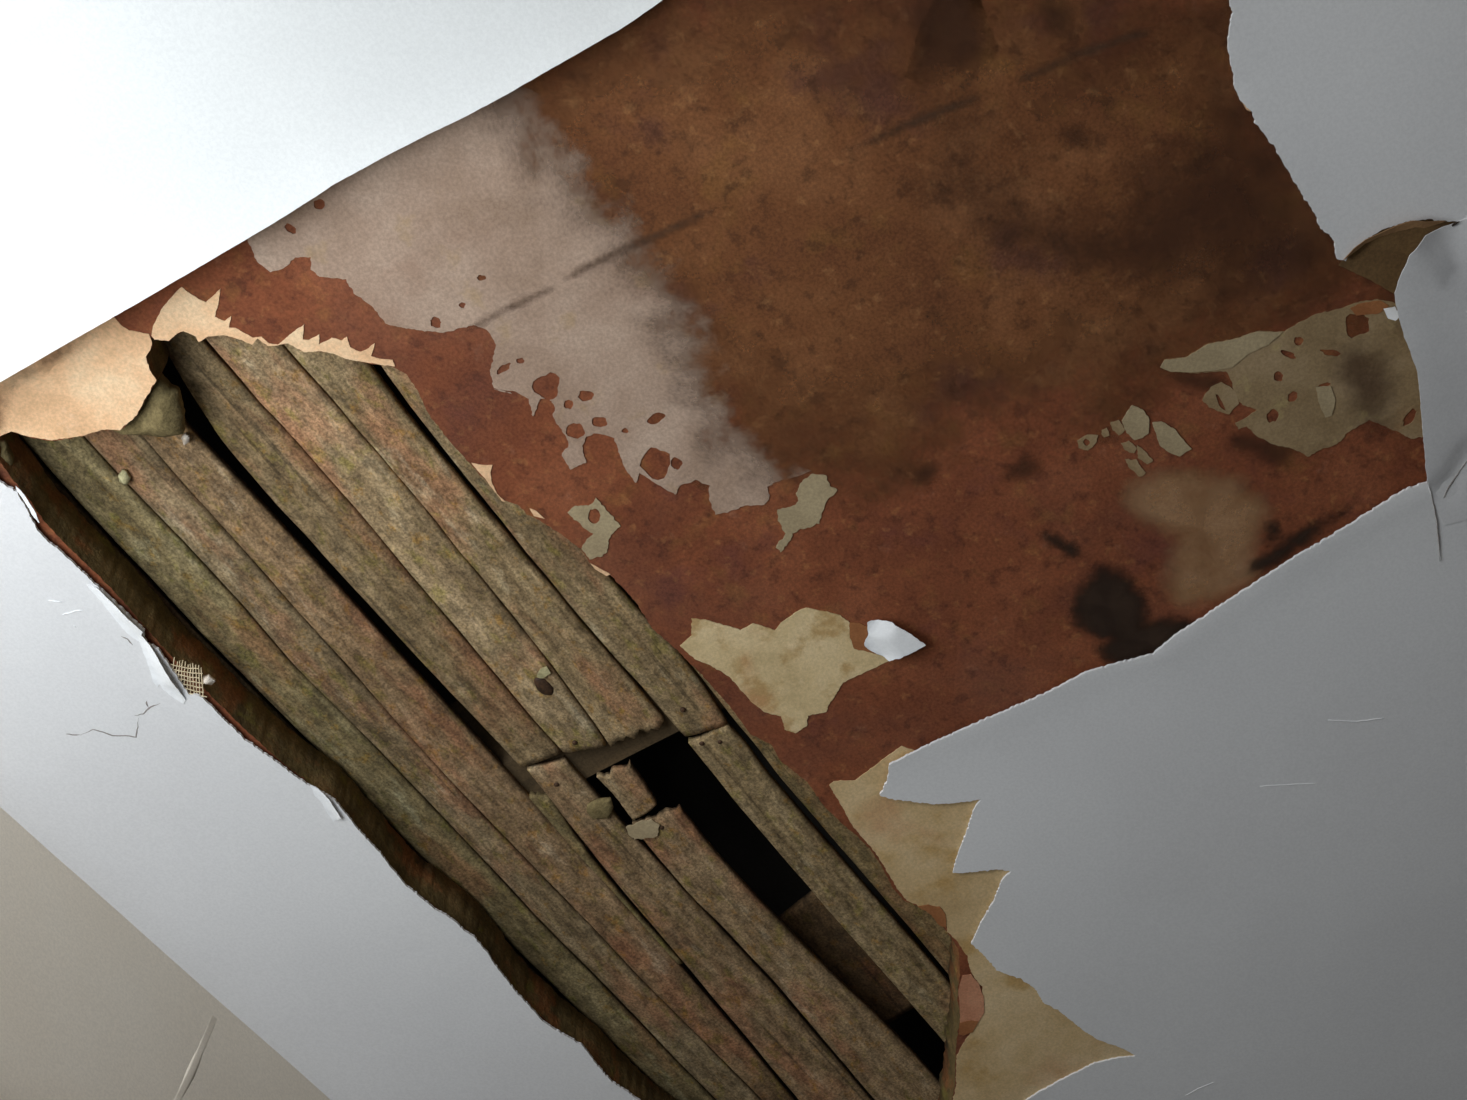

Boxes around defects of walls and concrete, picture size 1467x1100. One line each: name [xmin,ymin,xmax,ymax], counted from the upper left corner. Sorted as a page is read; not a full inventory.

flaking render [614,0,760,78]
flaking render [787,0,1317,227]
water stain [520,0,1326,473]
flaking render [106,46,1427,906]
crack [68,701,160,738]
flaking render [0,432,677,1100]
water stain [1076,573,1187,661]
flaking render [938,926,985,1100]